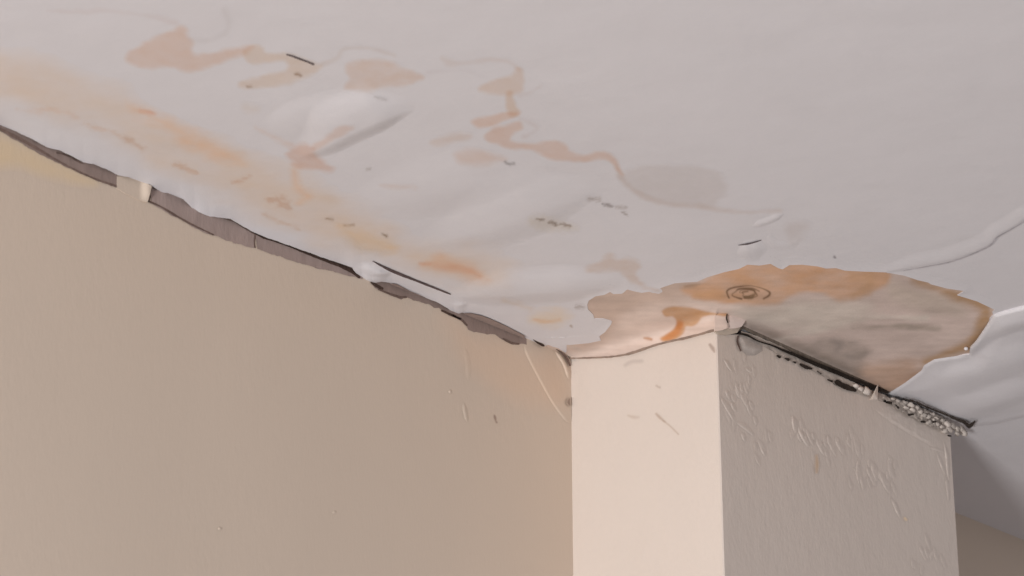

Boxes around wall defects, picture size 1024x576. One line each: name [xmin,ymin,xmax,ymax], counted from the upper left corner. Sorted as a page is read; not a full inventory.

water stain [0,6,812,331]
peeling [0,107,1024,501]